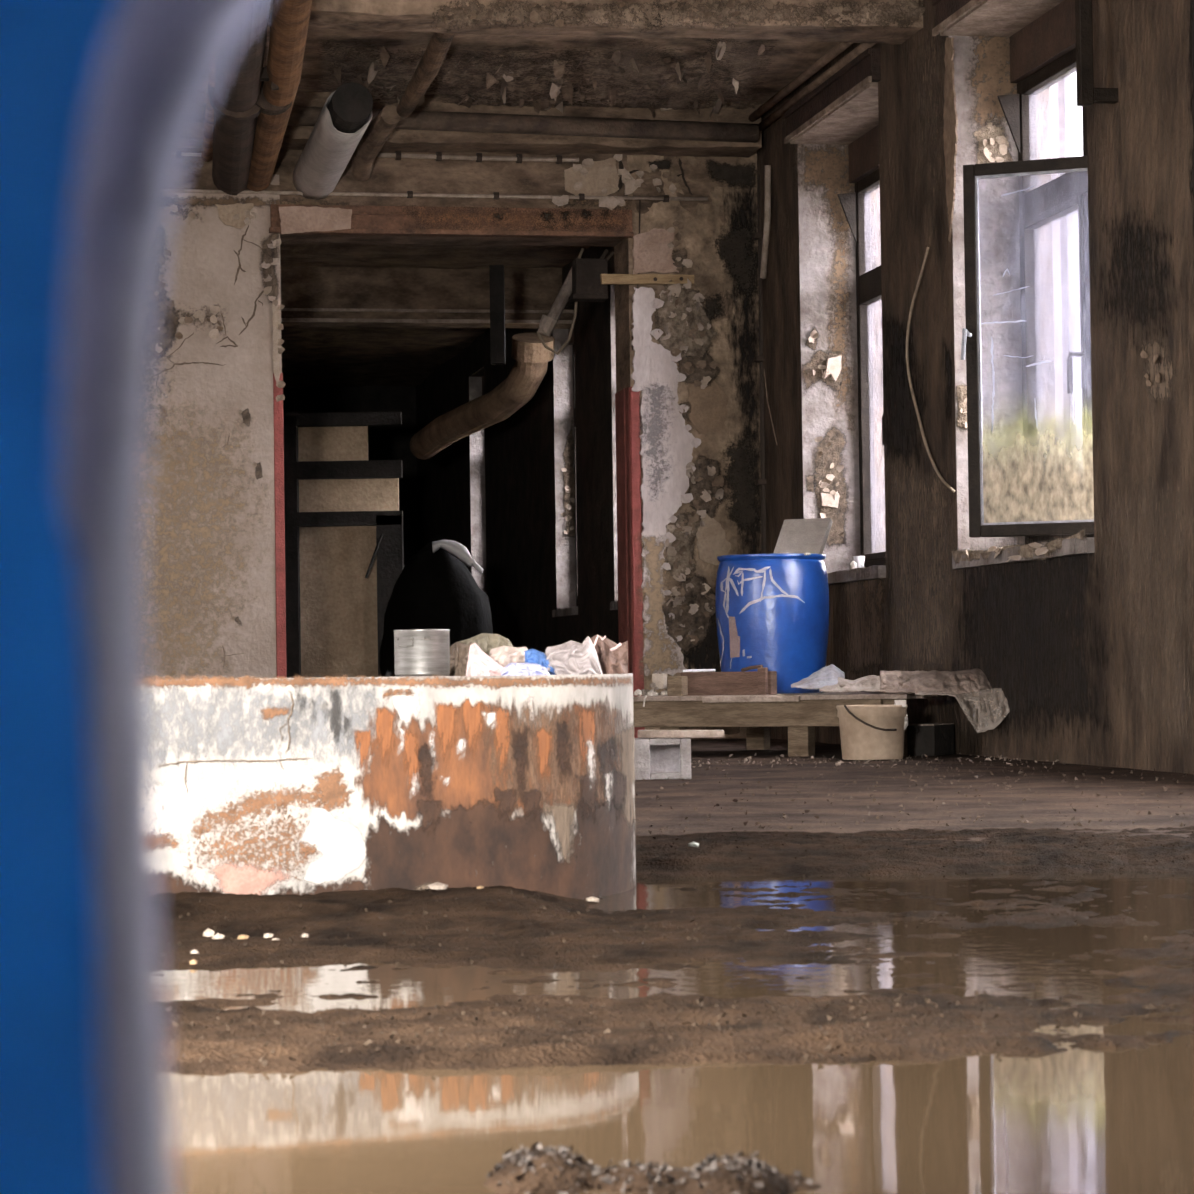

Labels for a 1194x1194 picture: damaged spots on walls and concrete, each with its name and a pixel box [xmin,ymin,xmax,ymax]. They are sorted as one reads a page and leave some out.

peeling [552,154,681,210]
peeling [943,37,958,242]
peeling [973,118,1013,164]
crack [152,225,264,387]
peeling [801,326,843,394]
peeling [631,220,731,689]
peeling [805,426,848,547]
rust [148,675,633,895]
spalling [213,863,290,895]
peeling [299,808,367,884]